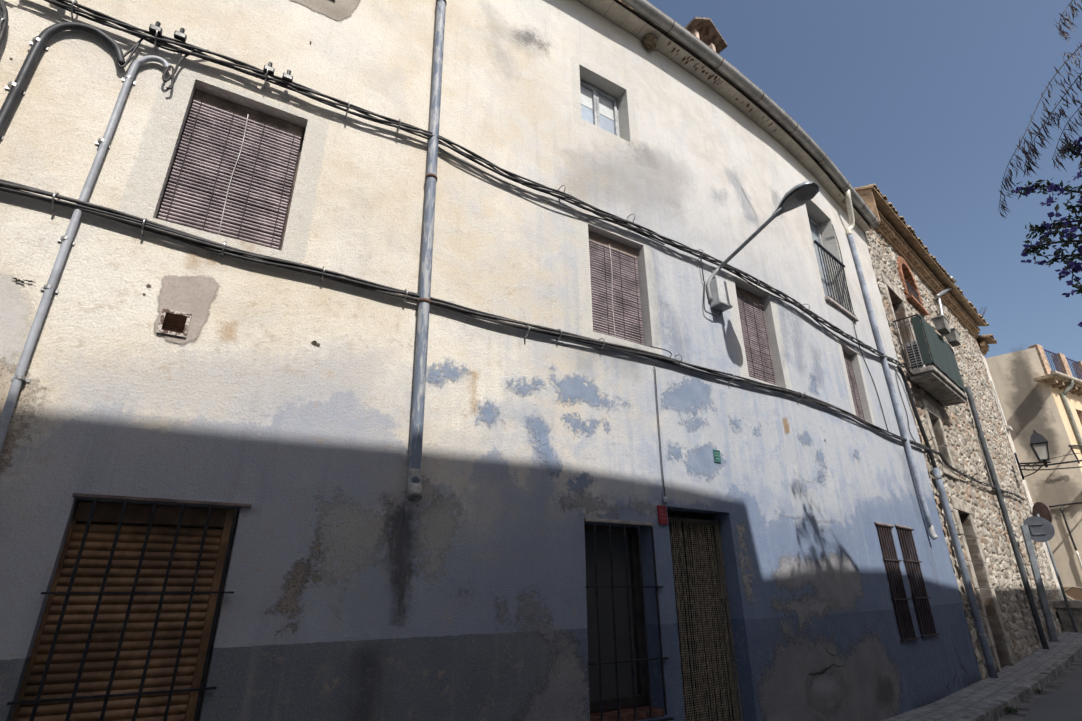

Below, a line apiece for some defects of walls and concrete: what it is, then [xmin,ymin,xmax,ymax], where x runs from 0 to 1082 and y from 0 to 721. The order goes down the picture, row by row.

peeling [0,274,50,472]
peeling [426,358,467,387]
peeling [477,401,500,427]
peeling [507,366,630,437]
peeling [661,376,717,432]
leakage [1014,360,1055,459]
peeling [526,415,658,519]
peeling [669,442,726,480]
flaking render [265,522,328,636]
leakage [383,509,413,623]
peeling [772,551,863,615]